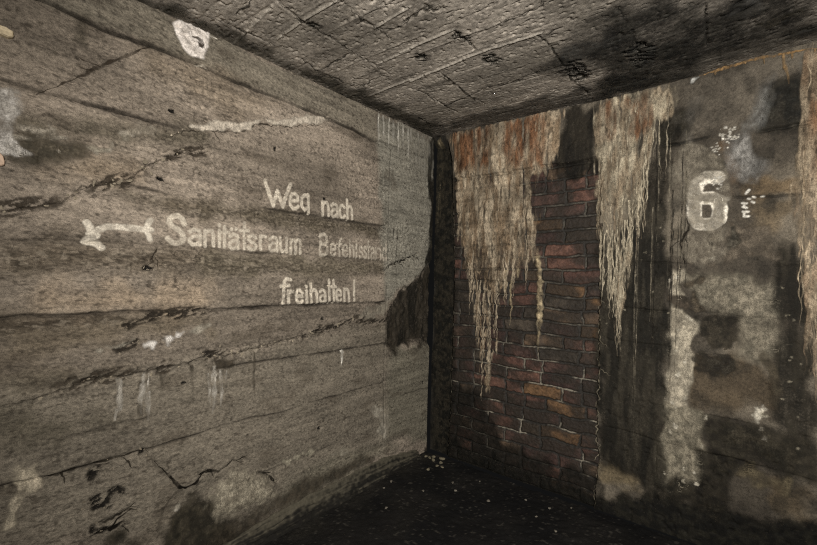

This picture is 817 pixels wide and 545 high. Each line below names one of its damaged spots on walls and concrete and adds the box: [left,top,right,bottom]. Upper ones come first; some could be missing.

crack [39,47,150,93]
leakage [138,0,271,55]
crack [234,0,276,46]
crack [281,5,382,88]
crack [339,0,439,45]
crack [417,74,492,108]
crack [539,29,589,94]
crack [0,121,325,217]
rust [449,109,565,396]
leakage [285,0,817,545]
crack [42,450,275,489]